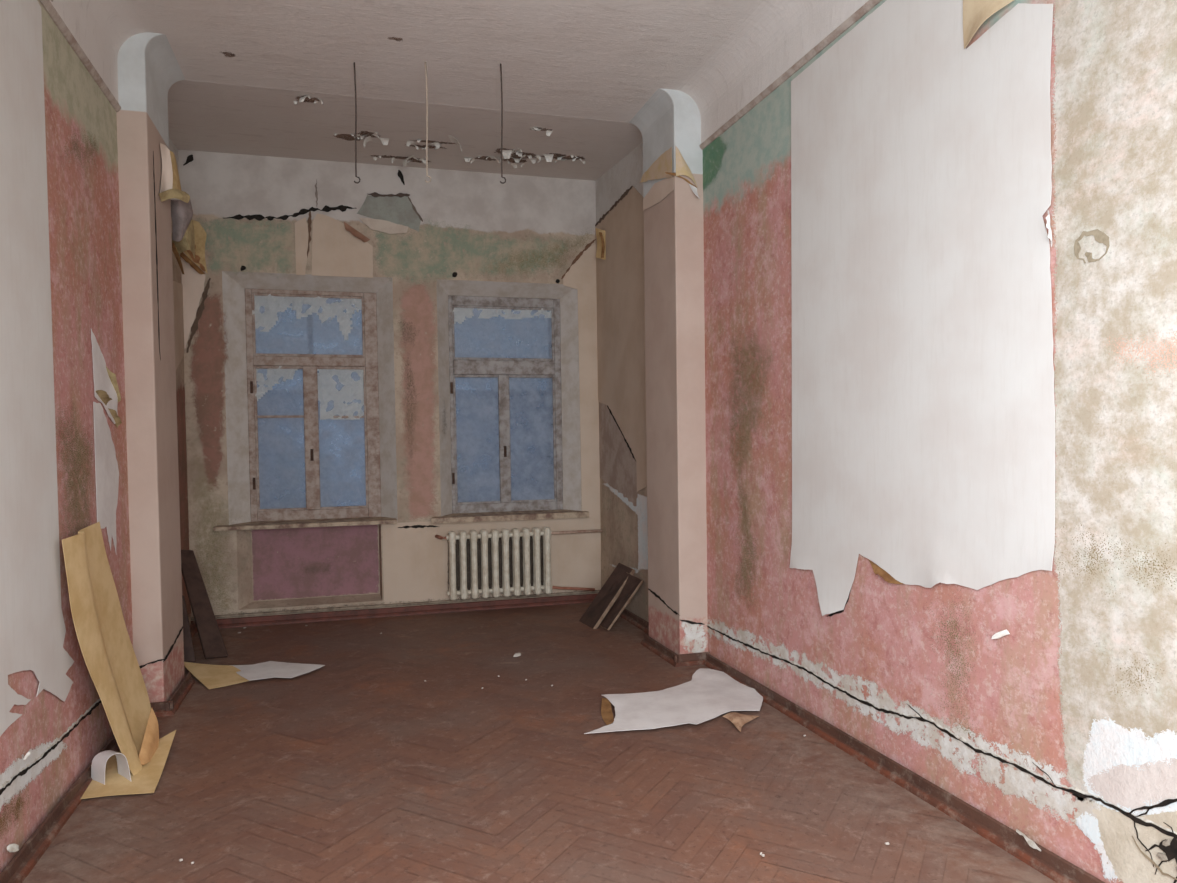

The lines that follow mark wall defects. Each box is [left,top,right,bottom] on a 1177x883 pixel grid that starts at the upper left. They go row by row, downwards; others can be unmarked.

crack [183,155,194,166]
crack [227,180,357,221]
flaking render [357,192,423,234]
peeling [332,131,585,168]
peeling [91,329,119,551]
peeling [188,293,229,492]
leakage [724,325,776,612]
flaking render [0,738,67,812]
crack [0,699,102,795]
crack [648,589,1177,880]
flaking render [680,618,1177,883]